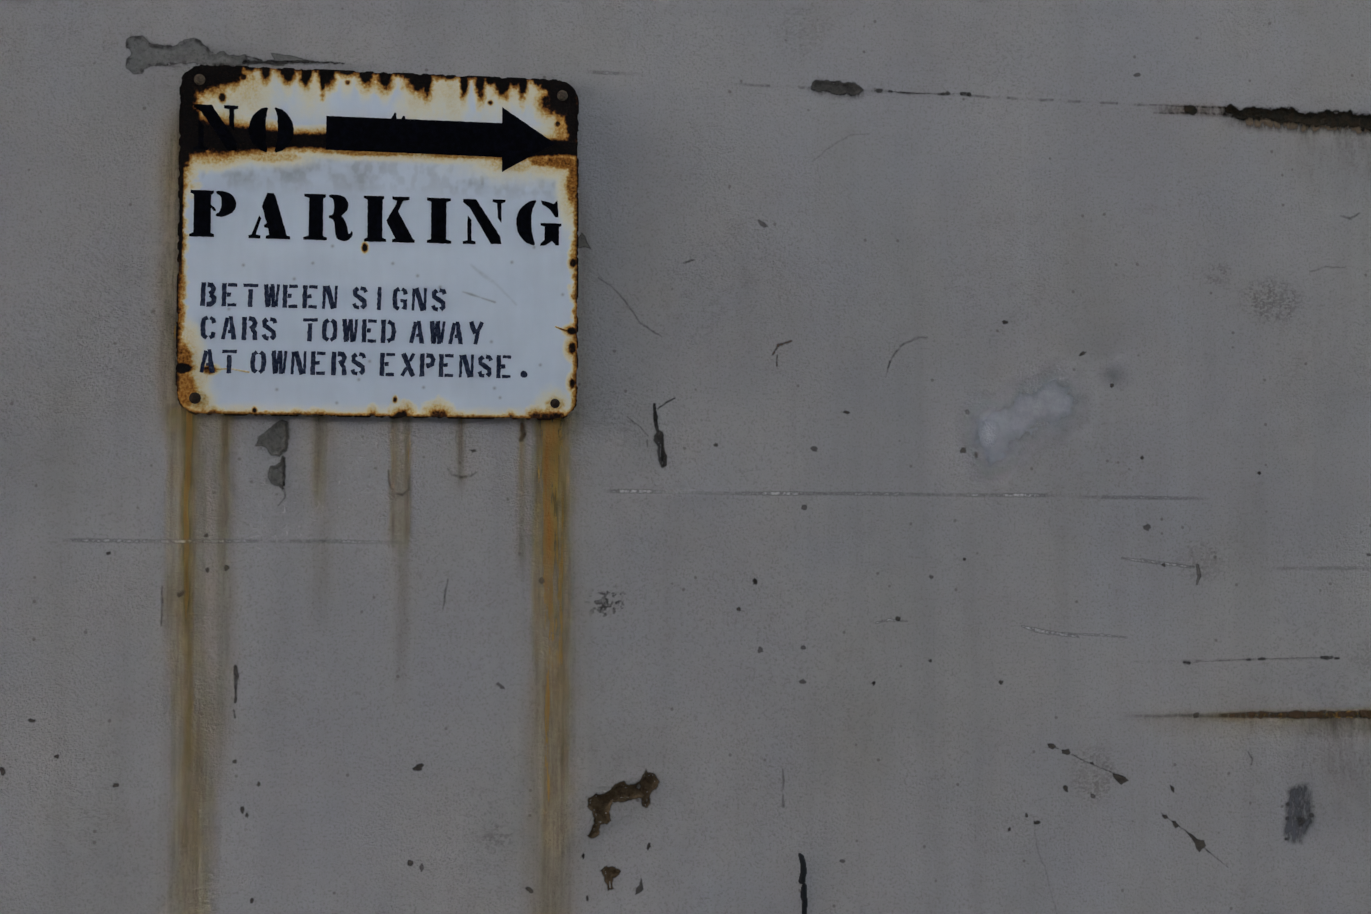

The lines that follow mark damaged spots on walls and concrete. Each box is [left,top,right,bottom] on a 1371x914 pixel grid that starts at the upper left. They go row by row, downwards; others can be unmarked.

crack [876,88,971,96]
rust [174,386,193,622]
rust [519,418,566,834]
spalling [582,770,660,859]